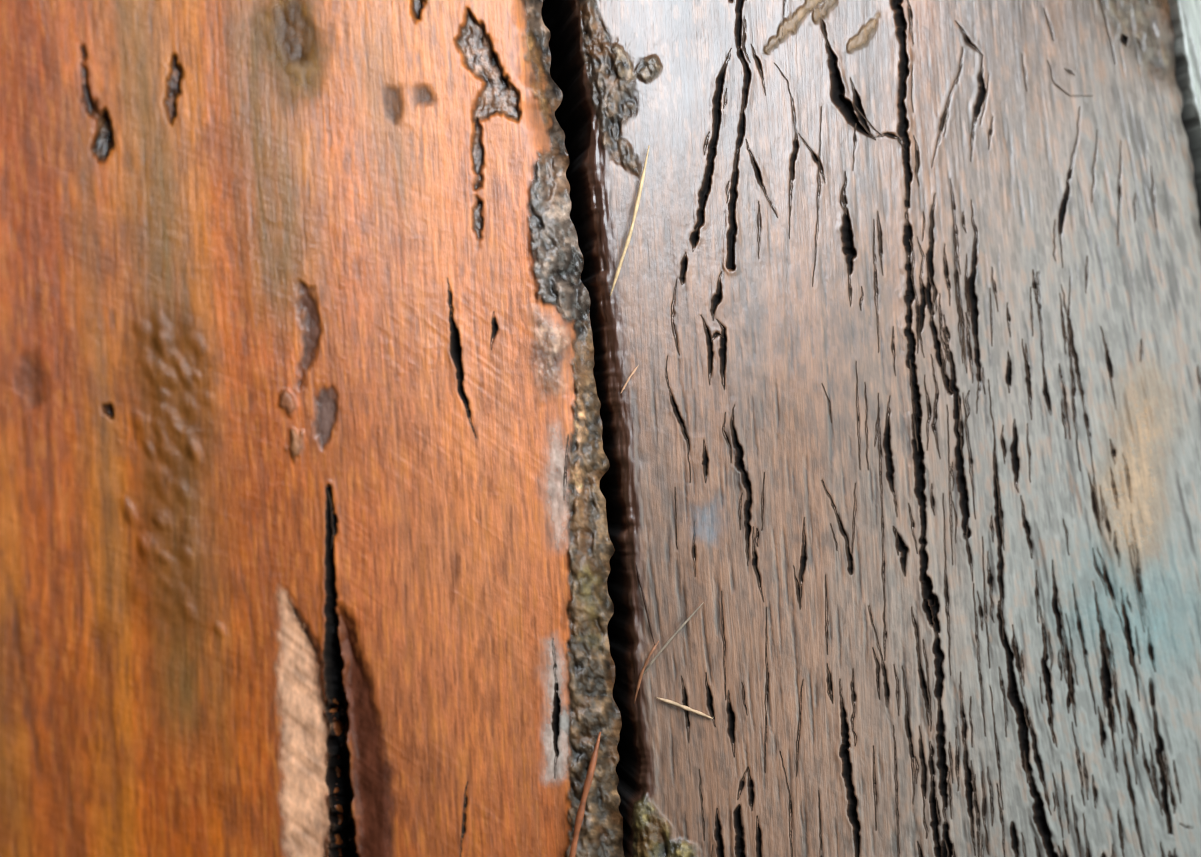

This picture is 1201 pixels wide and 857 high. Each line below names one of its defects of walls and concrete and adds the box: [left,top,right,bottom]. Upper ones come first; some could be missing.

crack [447,277,477,439]
crack [490,311,498,349]
crack [666,0,1193,857]
crack [286,487,358,857]